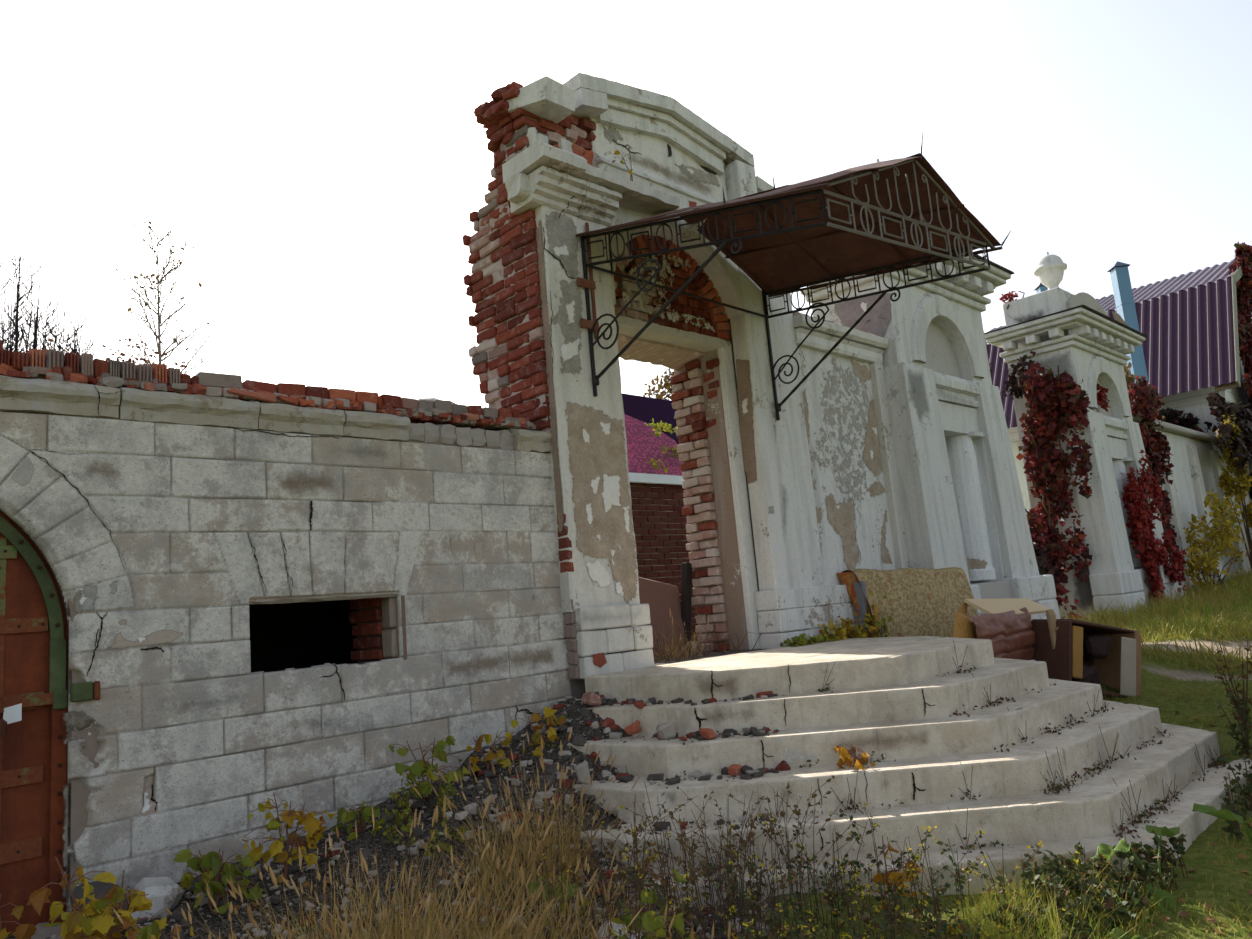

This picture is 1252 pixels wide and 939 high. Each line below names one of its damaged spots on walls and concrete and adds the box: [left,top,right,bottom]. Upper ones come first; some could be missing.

spalling [474,86,522,126]
peeling [536,211,638,604]
peeling [802,360,893,570]
crack [248,533,293,594]
crack [86,612,107,677]
spalling [63,711,99,749]
crack [694,671,723,729]
spalling [141,786,157,816]
spalling [62,785,84,898]